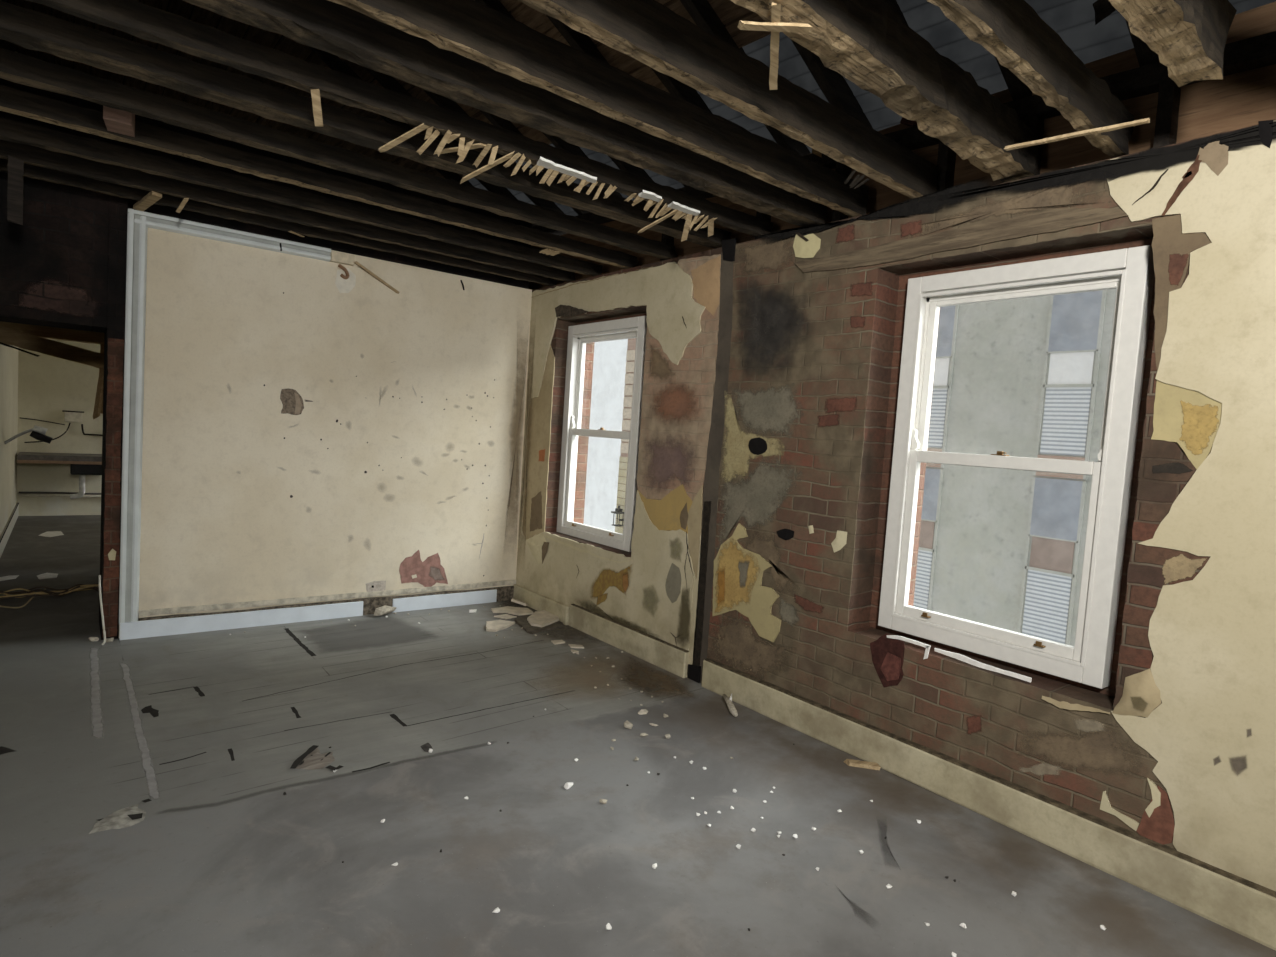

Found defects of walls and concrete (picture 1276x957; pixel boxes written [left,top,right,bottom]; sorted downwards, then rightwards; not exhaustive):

flaking render [1198,141,1229,176]
crack [1132,155,1202,216]
flaking render [555,305,588,317]
flaking render [280,388,313,415]
flaking render [522,345,555,563]
flaking render [637,180,1222,849]
damp [671,540,681,558]
peeling [399,550,448,587]
damp [678,590,690,645]
damp [1076,720,1102,731]
damp [1022,763,1058,775]